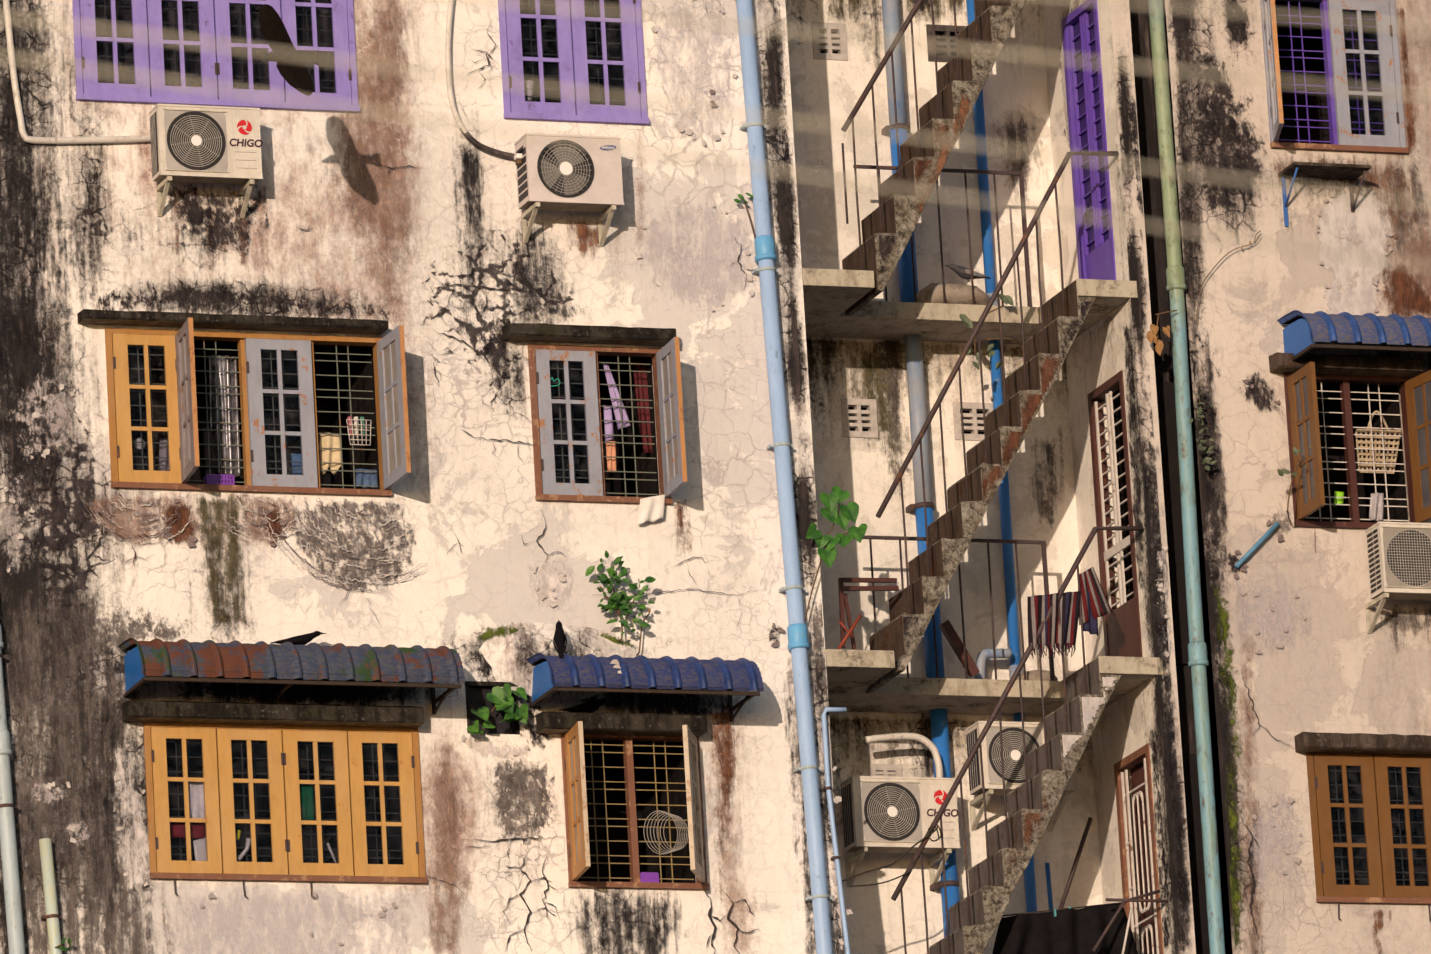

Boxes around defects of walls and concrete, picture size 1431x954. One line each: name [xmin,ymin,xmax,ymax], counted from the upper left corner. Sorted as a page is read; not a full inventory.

damp [828,0,880,66]
damp [907,0,963,22]
damp [767,0,796,267]
crack [430,284,539,382]
damp [423,143,603,412]
rust [1383,266,1431,316]
damp [0,0,430,954]
crack [461,429,538,461]
damp [1172,0,1420,954]
crack [521,510,565,566]
damp [1381,605,1431,647]
crack [463,837,559,951]